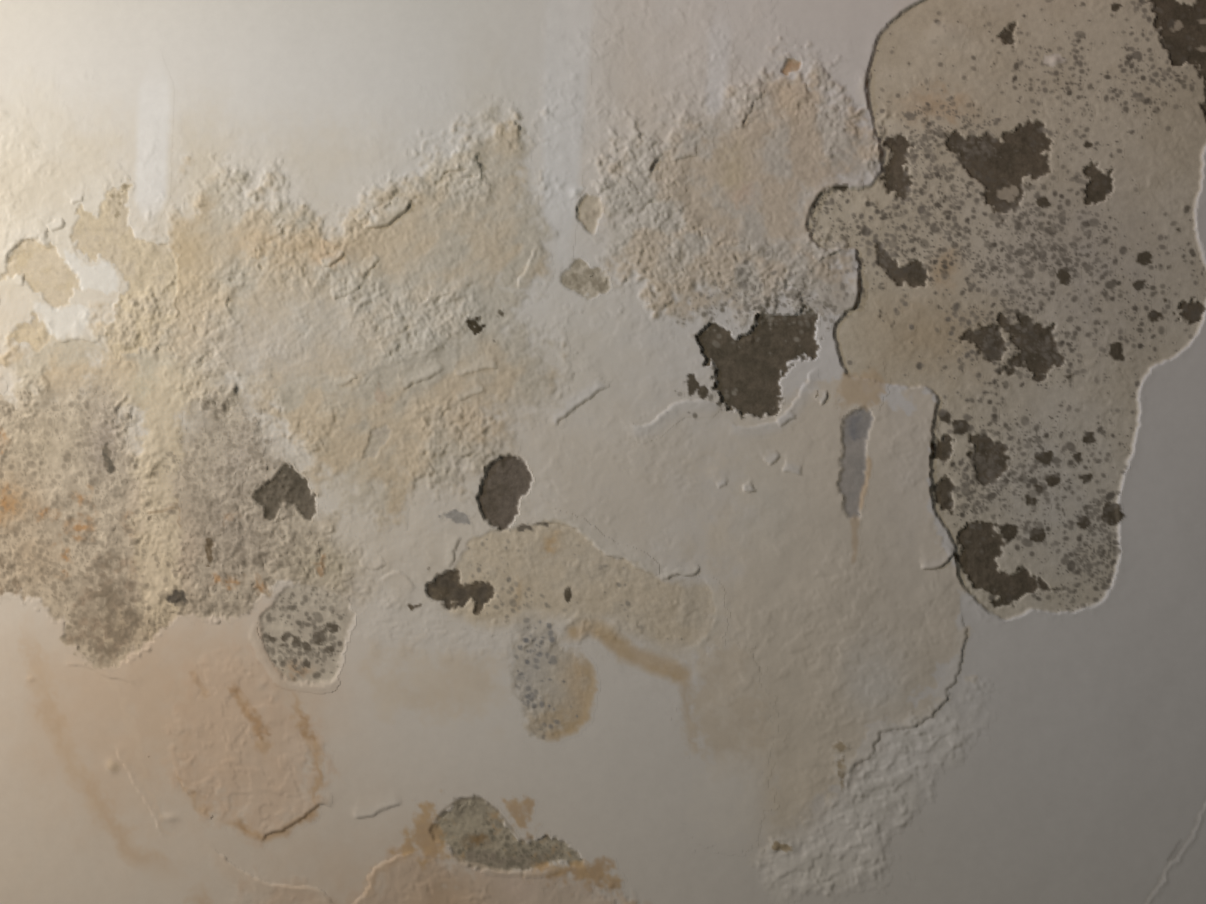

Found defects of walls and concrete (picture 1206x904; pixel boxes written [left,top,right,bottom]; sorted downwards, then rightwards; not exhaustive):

spalling [0,175,730,745]
spalling [672,0,1206,622]
damp [148,619,655,904]
spalling [387,787,627,904]